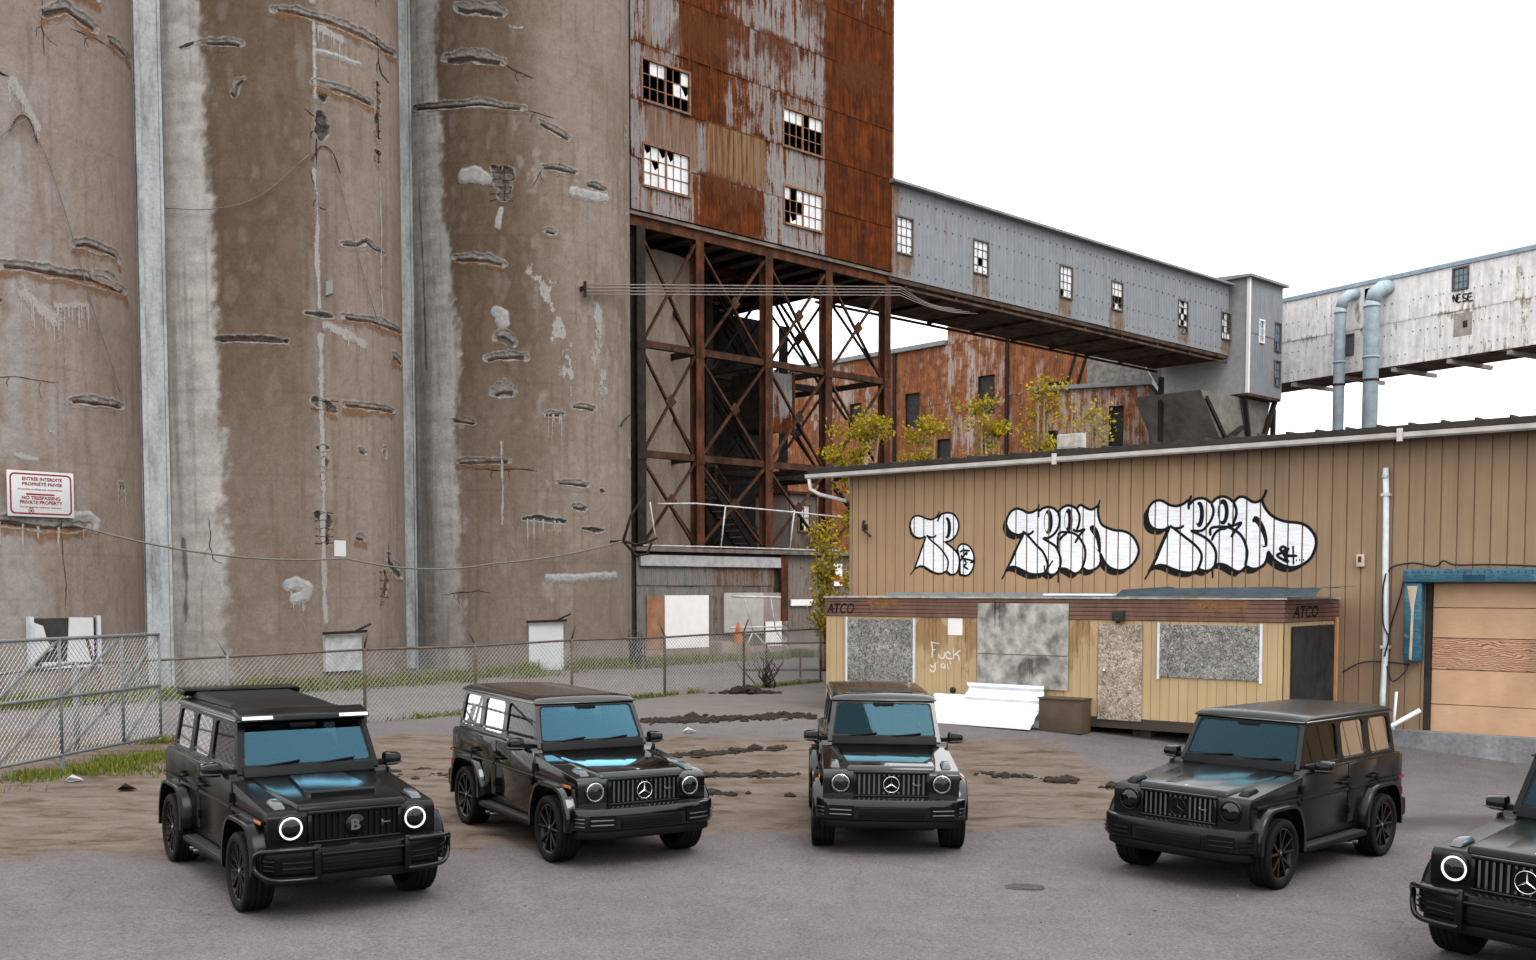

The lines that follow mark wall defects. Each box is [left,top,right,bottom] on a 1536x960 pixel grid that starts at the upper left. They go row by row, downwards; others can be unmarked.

spalling [32,0,131,70]
spalling [264,0,397,64]
rust [671,9,798,73]
rust [804,0,836,39]
spalling [306,73,384,170]
spalling [411,94,629,234]
spalling [0,232,129,310]